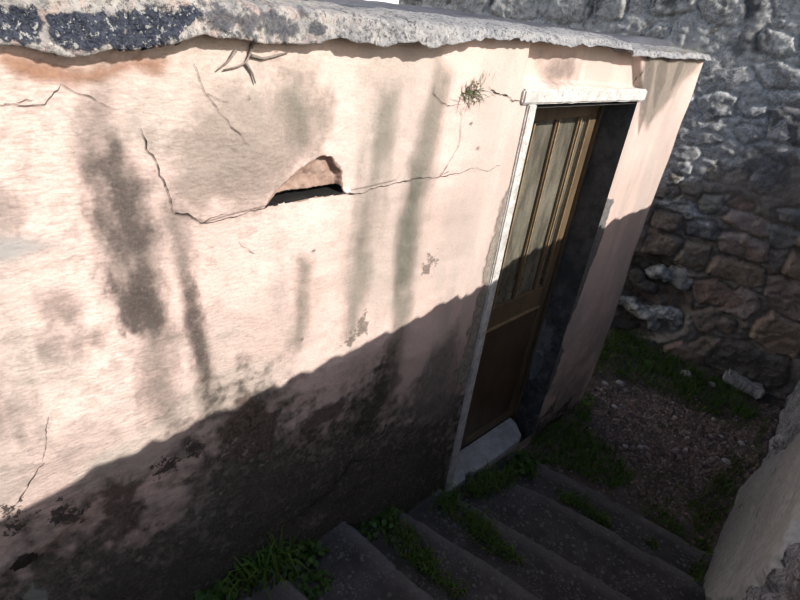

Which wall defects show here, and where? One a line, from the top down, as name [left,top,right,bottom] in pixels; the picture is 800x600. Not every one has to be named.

crack [1,84,119,110]
crack [194,64,248,144]
crack [141,129,267,223]
hole [266,155,351,206]
crack [341,143,498,195]
leakage [87,142,167,406]
leakage [186,285,207,371]
leakage [0,310,465,600]
peeling [0,496,91,536]
hole [9,552,38,572]